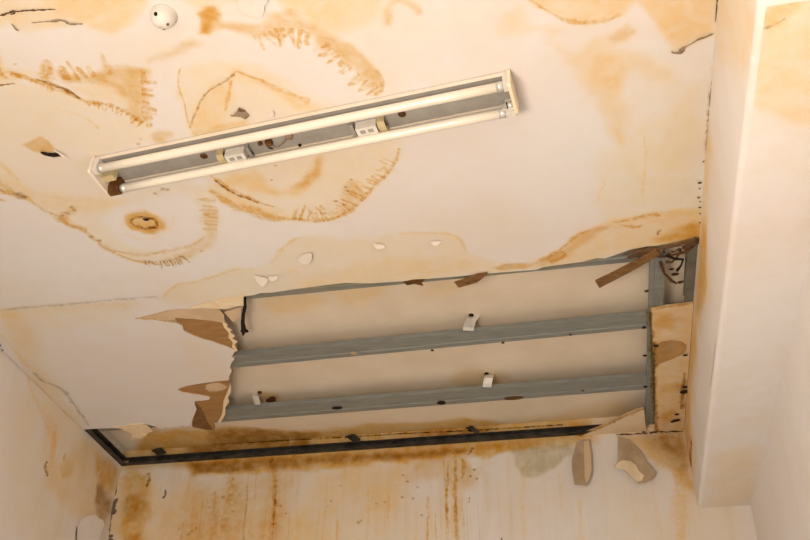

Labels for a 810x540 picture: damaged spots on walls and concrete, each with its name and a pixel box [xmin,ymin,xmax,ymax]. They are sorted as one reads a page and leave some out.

water stain [623,237,699,258]
peeling [76,515,105,540]